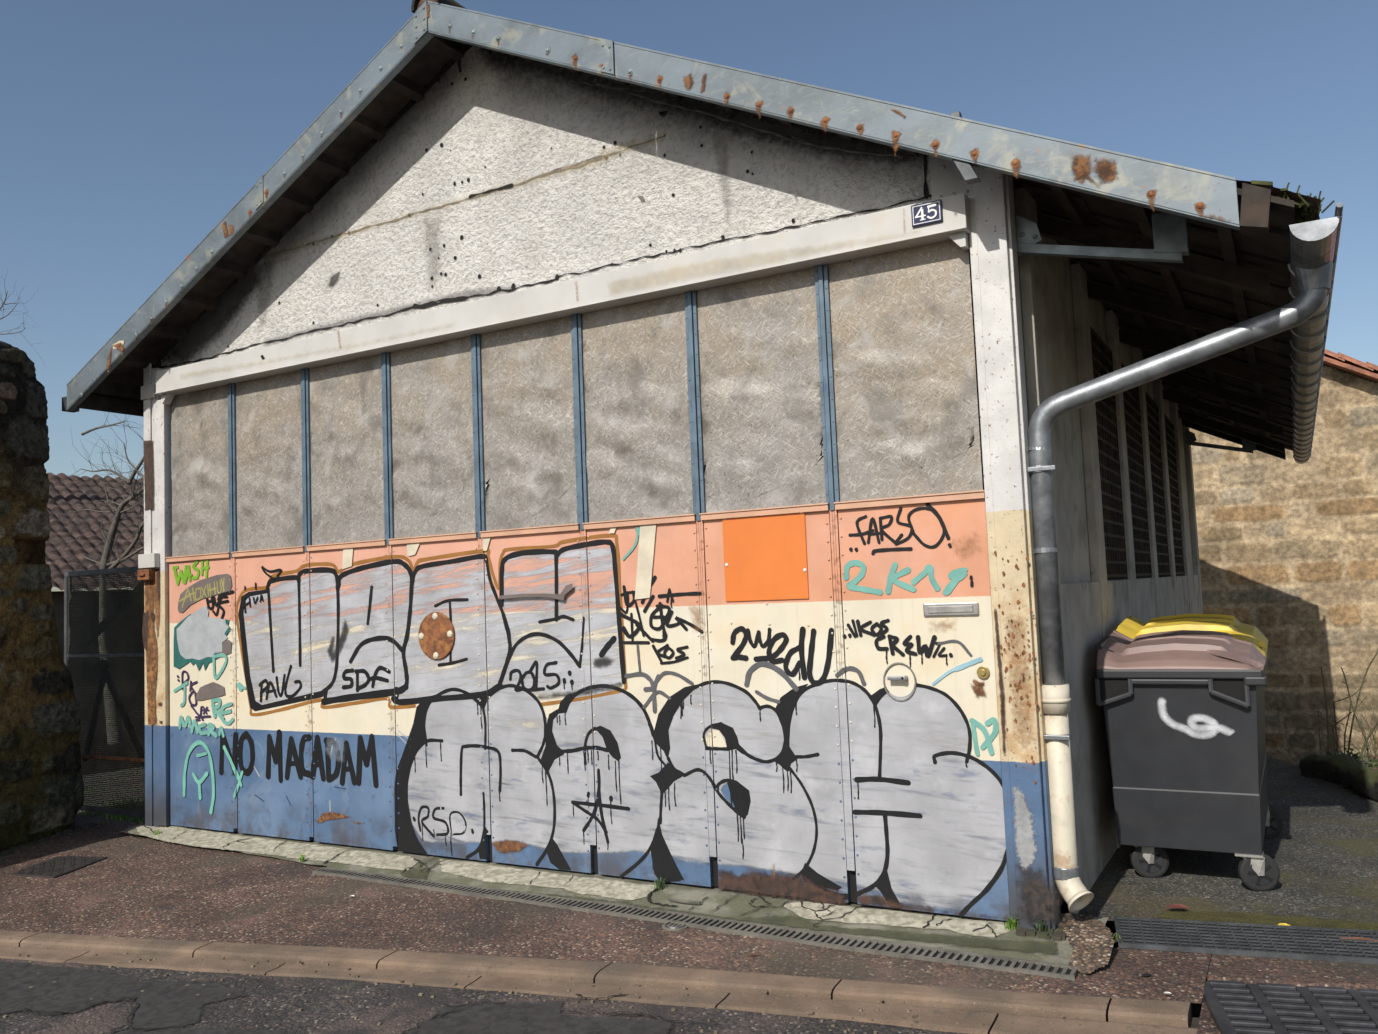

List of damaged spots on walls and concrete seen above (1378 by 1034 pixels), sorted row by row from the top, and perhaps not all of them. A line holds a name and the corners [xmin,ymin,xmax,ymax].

rust [683,74,706,93]
crack [159,80,932,368]
rust [1072,154,1117,183]
peeling [994,551,1040,731]
peeling [1013,747,1037,870]